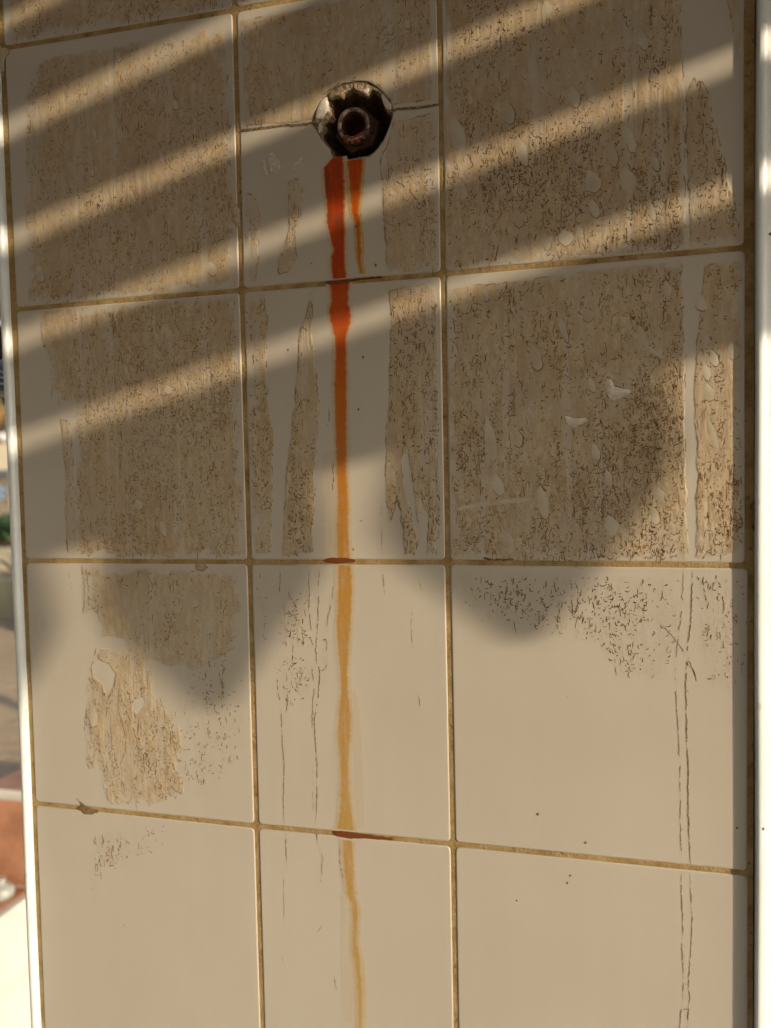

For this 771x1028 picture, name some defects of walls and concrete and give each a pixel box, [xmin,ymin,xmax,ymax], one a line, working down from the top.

crack [95,825,164,880]
corrosion [320,156,393,1028]
crack [10,0,747,810]